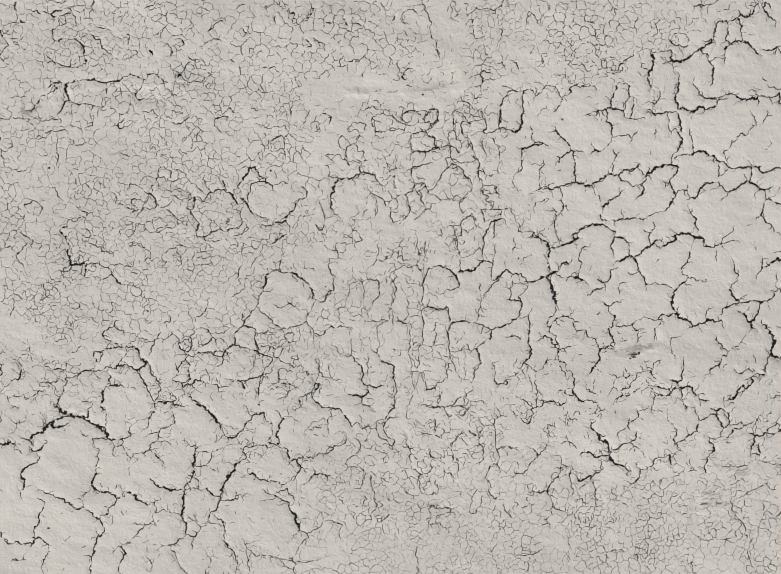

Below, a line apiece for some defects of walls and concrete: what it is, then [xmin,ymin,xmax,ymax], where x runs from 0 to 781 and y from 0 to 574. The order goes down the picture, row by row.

crack [515,126,548,173]